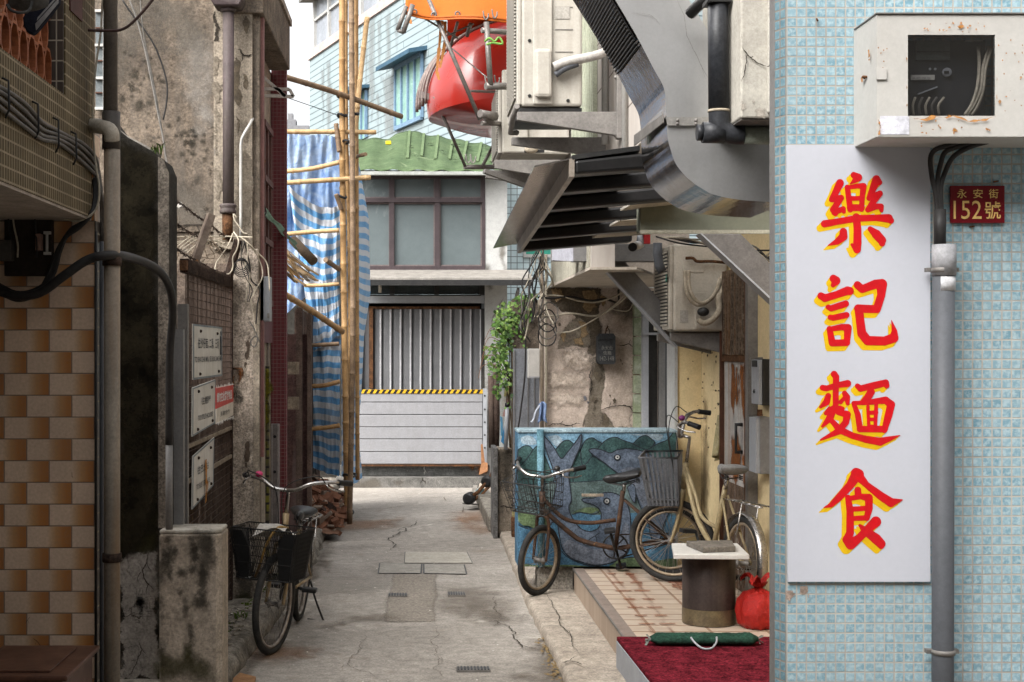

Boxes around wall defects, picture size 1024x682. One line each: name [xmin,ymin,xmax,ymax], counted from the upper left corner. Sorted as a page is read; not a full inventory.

leakage [120,58,164,109]
crack [741,47,769,81]
leakage [167,117,214,174]
rust [914,115,991,134]
spalling [548,287,627,427]
leakage [120,137,213,659]
rust [731,363,744,417]
rust [730,436,744,484]
crack [360,466,464,550]
crack [492,595,581,664]